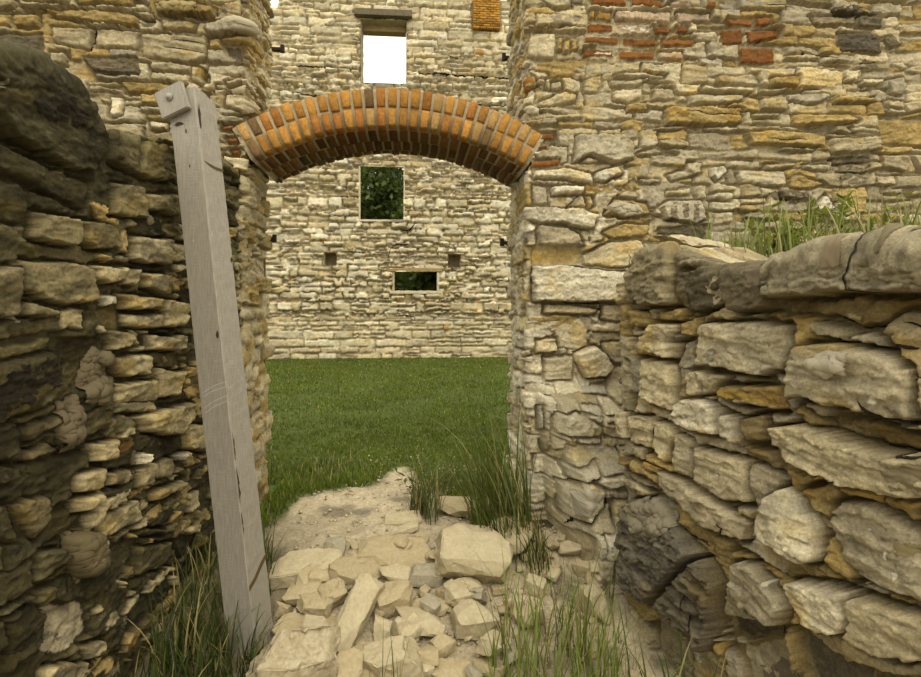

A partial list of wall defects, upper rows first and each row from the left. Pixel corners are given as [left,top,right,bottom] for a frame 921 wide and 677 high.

crack [290,64,362,72]
crack [415,54,508,79]